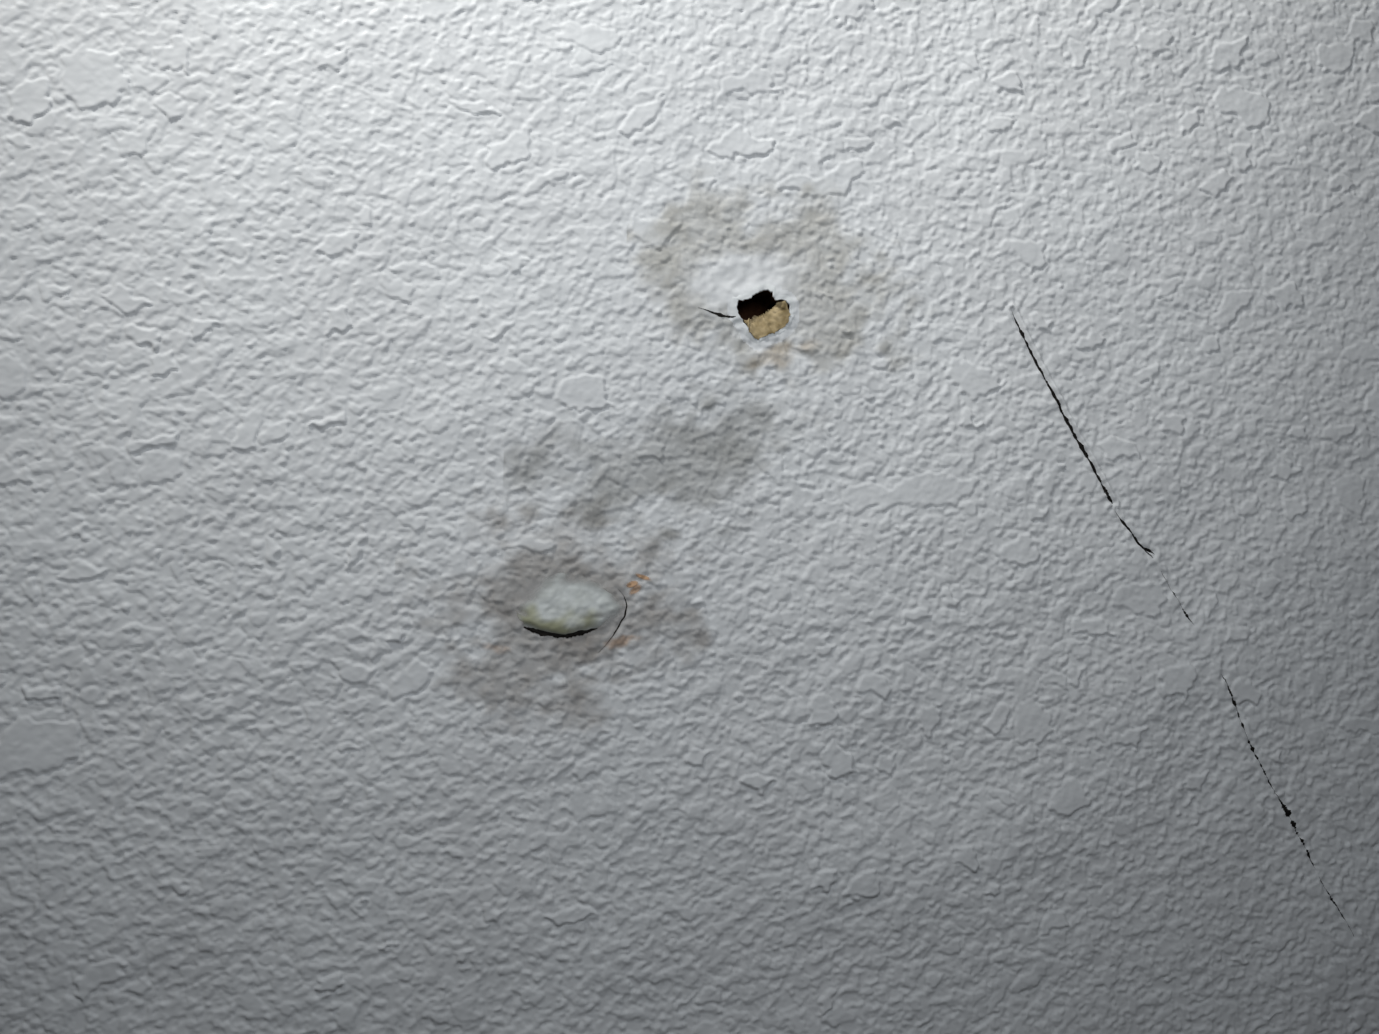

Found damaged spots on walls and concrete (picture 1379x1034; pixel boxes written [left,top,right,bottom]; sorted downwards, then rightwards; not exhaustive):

spalling [743,300,791,340]
crack [1012,312,1192,622]
crack [1222,676,1354,936]